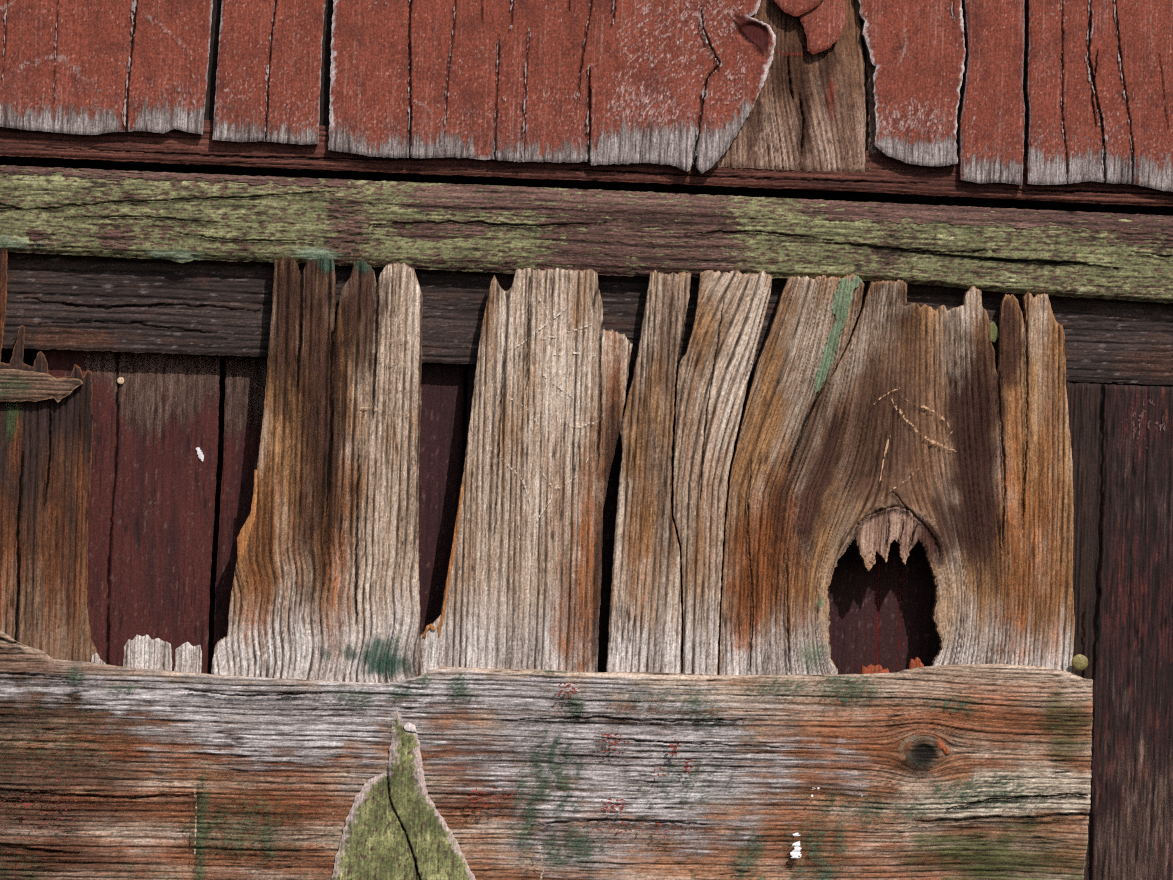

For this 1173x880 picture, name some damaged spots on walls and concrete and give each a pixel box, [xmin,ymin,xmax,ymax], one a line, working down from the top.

peeling [0,100,121,135]
crack [46,0,427,161]
peeling [135,0,753,173]
crack [569,0,927,184]
peeling [774,0,846,55]
peeling [875,98,1173,192]
crack [1007,0,1173,196]
water stain [152,251,199,261]
crack [386,771,421,880]
peeling [790,833,802,859]